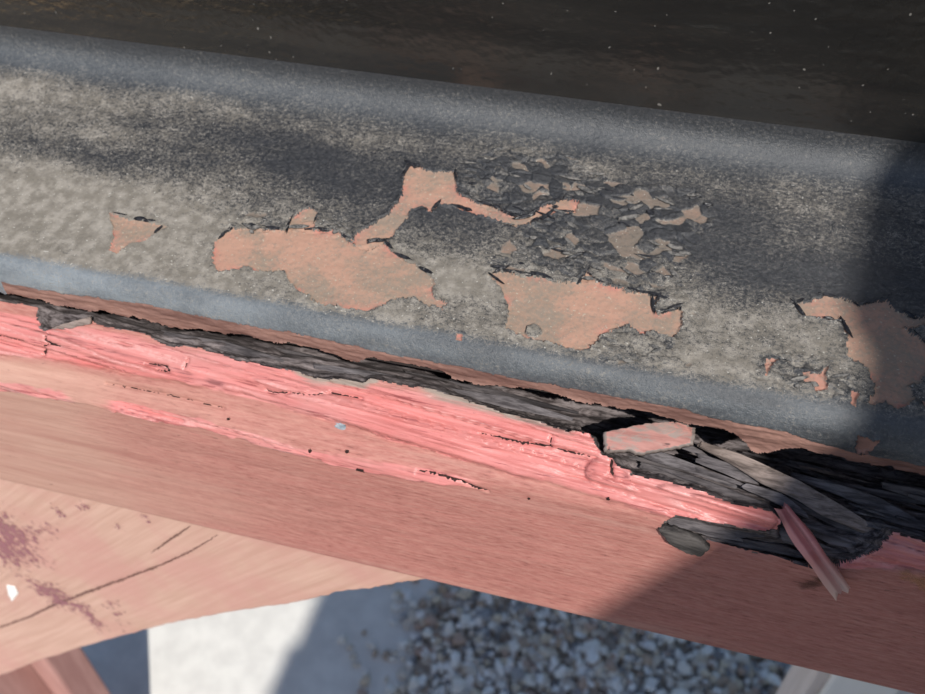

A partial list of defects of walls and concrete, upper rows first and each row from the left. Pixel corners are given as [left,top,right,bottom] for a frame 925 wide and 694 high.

peeling [109,212,167,254]
peeling [212,142,717,368]
spalling [0,282,925,569]
water stain [0,512,101,631]
crack [0,526,218,628]